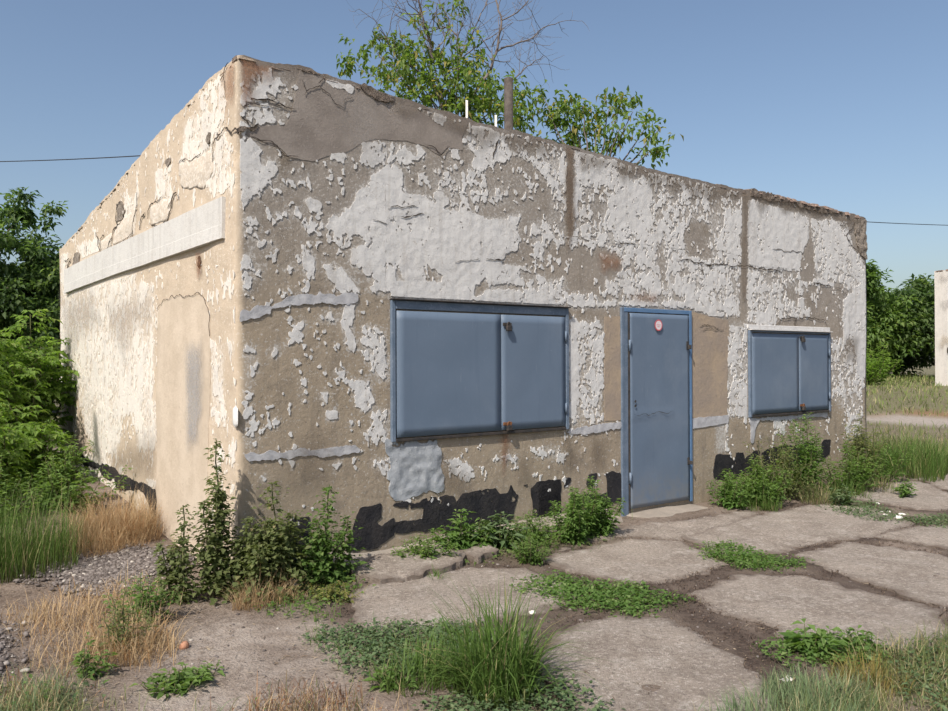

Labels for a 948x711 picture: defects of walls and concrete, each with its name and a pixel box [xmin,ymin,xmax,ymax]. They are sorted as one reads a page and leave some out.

crack [178,76,352,164]
crack [157,292,210,336]
peeling [60,68,868,518]
crack [681,249,802,278]